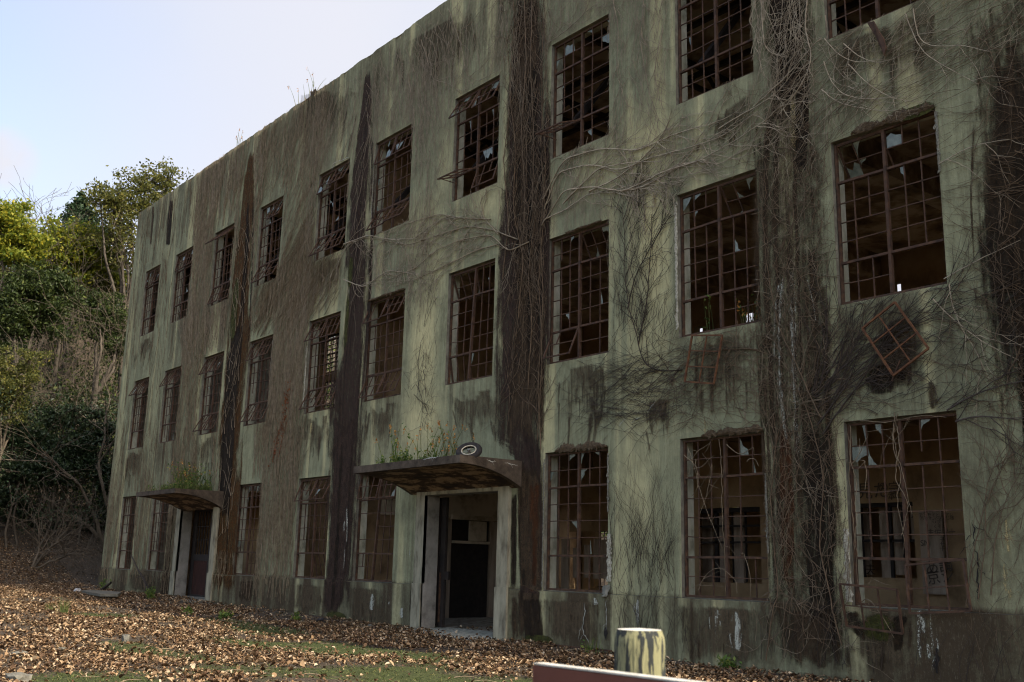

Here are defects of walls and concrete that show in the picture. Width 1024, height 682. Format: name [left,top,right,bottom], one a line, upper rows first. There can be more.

leakage [193,153,254,600]
leakage [295,73,394,622]
leakage [397,20,475,90]
leakage [453,0,605,641]
leakage [681,0,939,669]